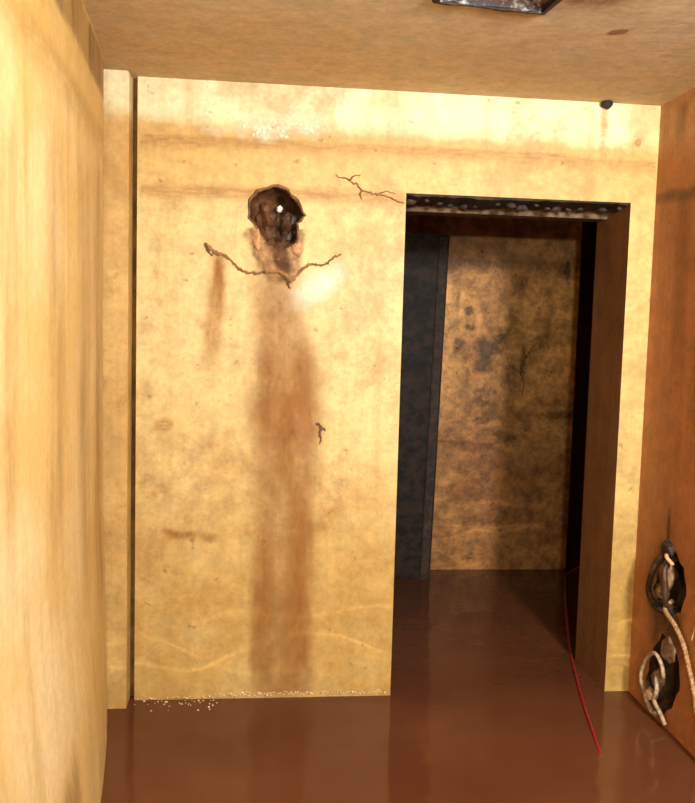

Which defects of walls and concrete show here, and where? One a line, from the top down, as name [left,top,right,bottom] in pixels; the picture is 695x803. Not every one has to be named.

crack [337,174,404,204]
crack [204,242,342,289]
damp [473,331,509,371]
corrosion [259,357,314,454]